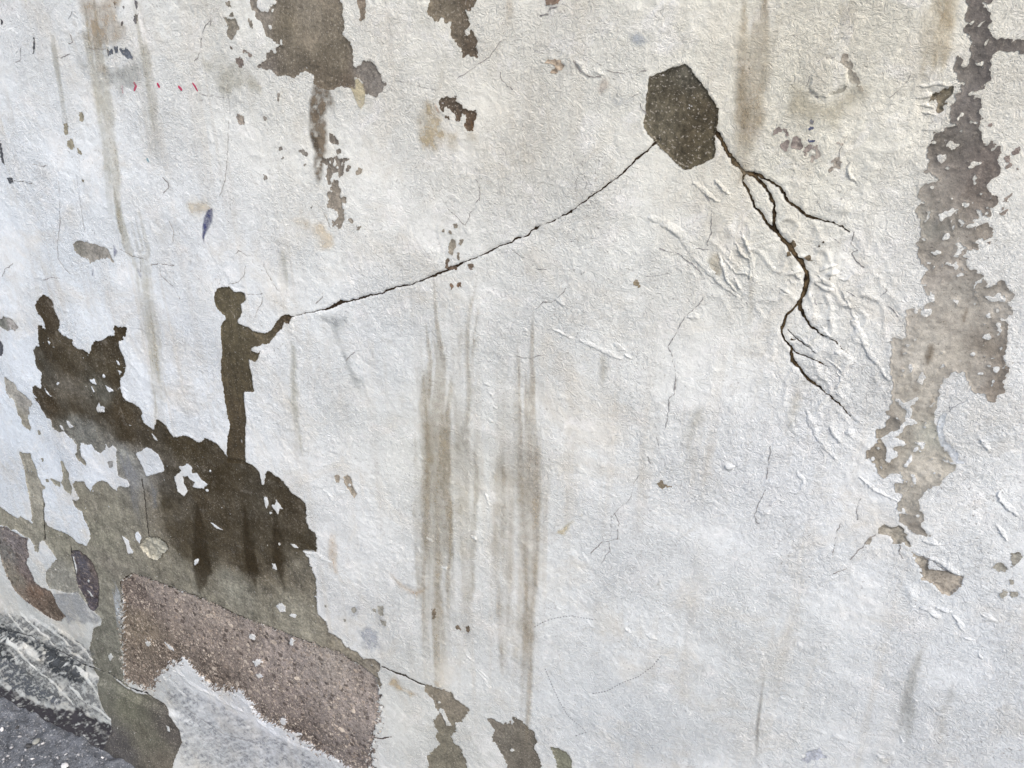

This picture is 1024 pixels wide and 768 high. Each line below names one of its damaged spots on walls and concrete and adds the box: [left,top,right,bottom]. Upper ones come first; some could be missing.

peeling [223,0,387,97]
peeling [427,0,478,58]
peeling [439,96,477,131]
peeling [320,133,362,230]
crack [292,142,658,317]
crack [713,130,903,420]
peeling [864,0,1024,598]
peeling [0,286,384,768]
peeling [425,684,470,768]
peeling [487,717,542,768]